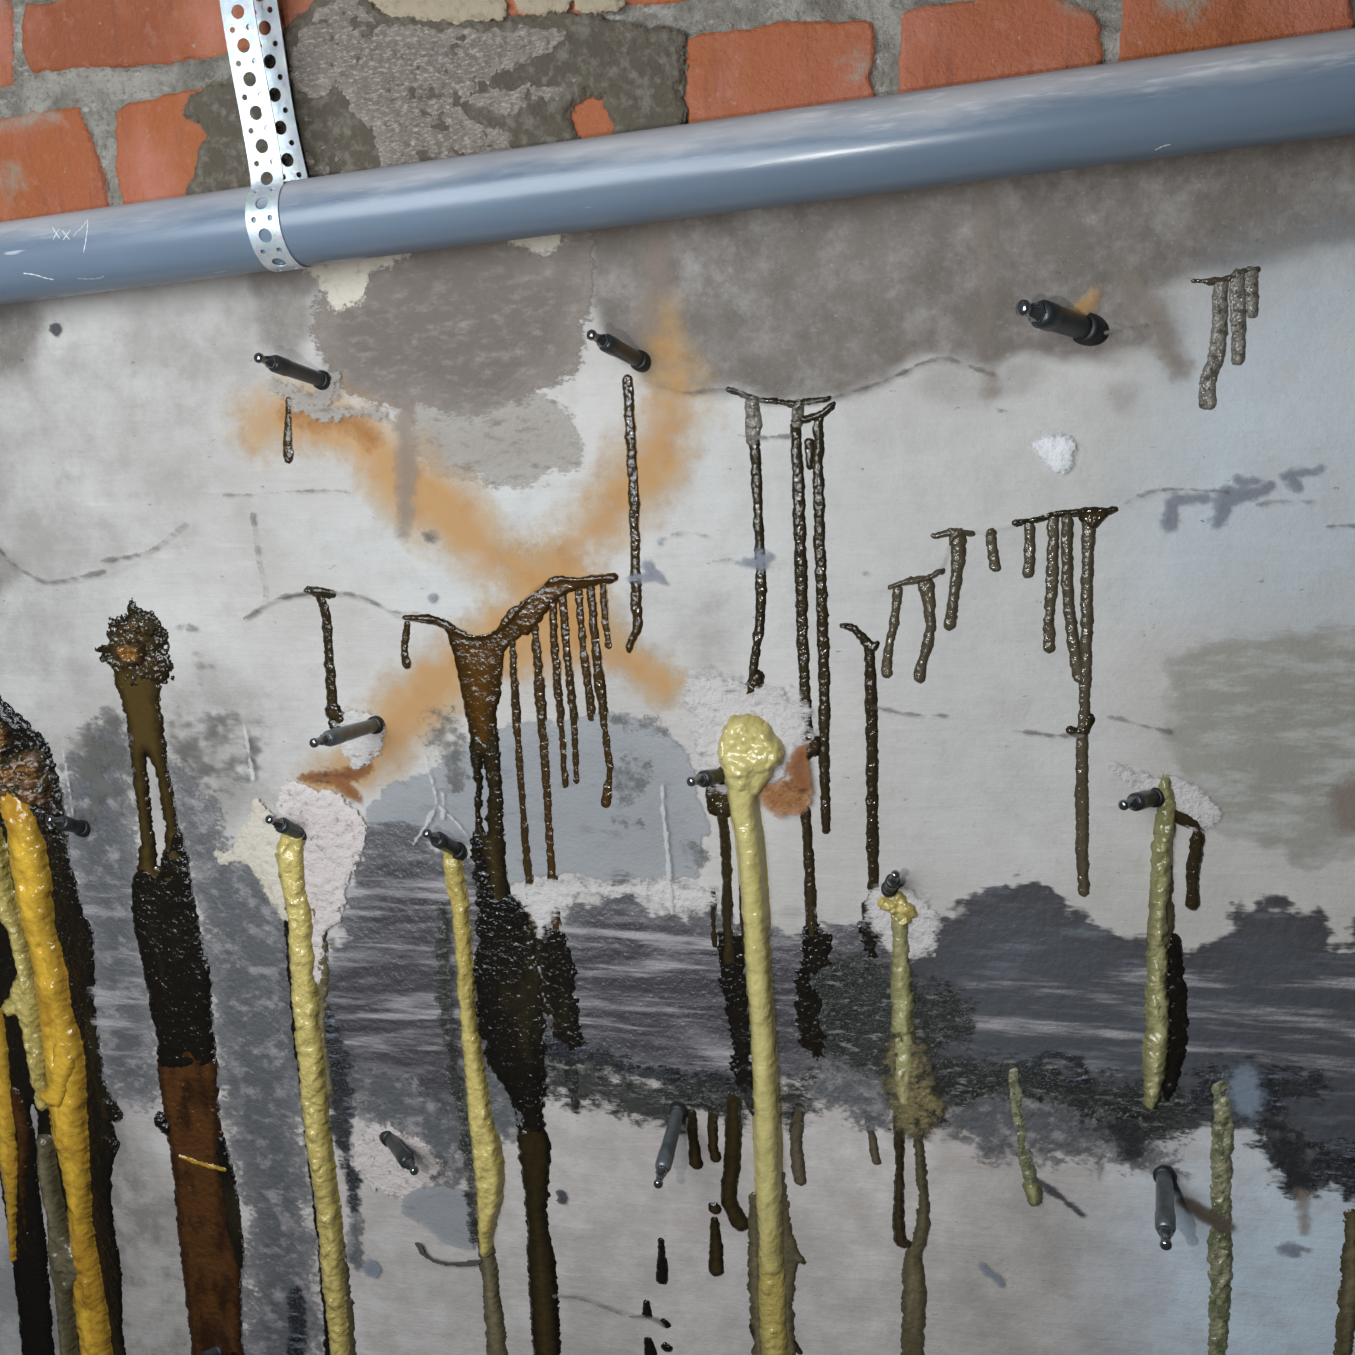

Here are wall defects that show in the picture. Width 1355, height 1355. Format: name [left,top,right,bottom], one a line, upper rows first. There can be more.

leakage [0,921,55,1355]
leakage [42,829,126,1355]
crack [0,525,183,584]
leakage [95,597,246,1355]
spalling [214,779,367,985]
corrosion [298,649,462,802]
corrosion [242,308,692,703]
leakage [366,374,754,1355]
corrosion [759,744,813,816]
leakage [725,386,1001,1186]
leakage [1012,506,1118,897]
leakage [864,971,1355,1355]